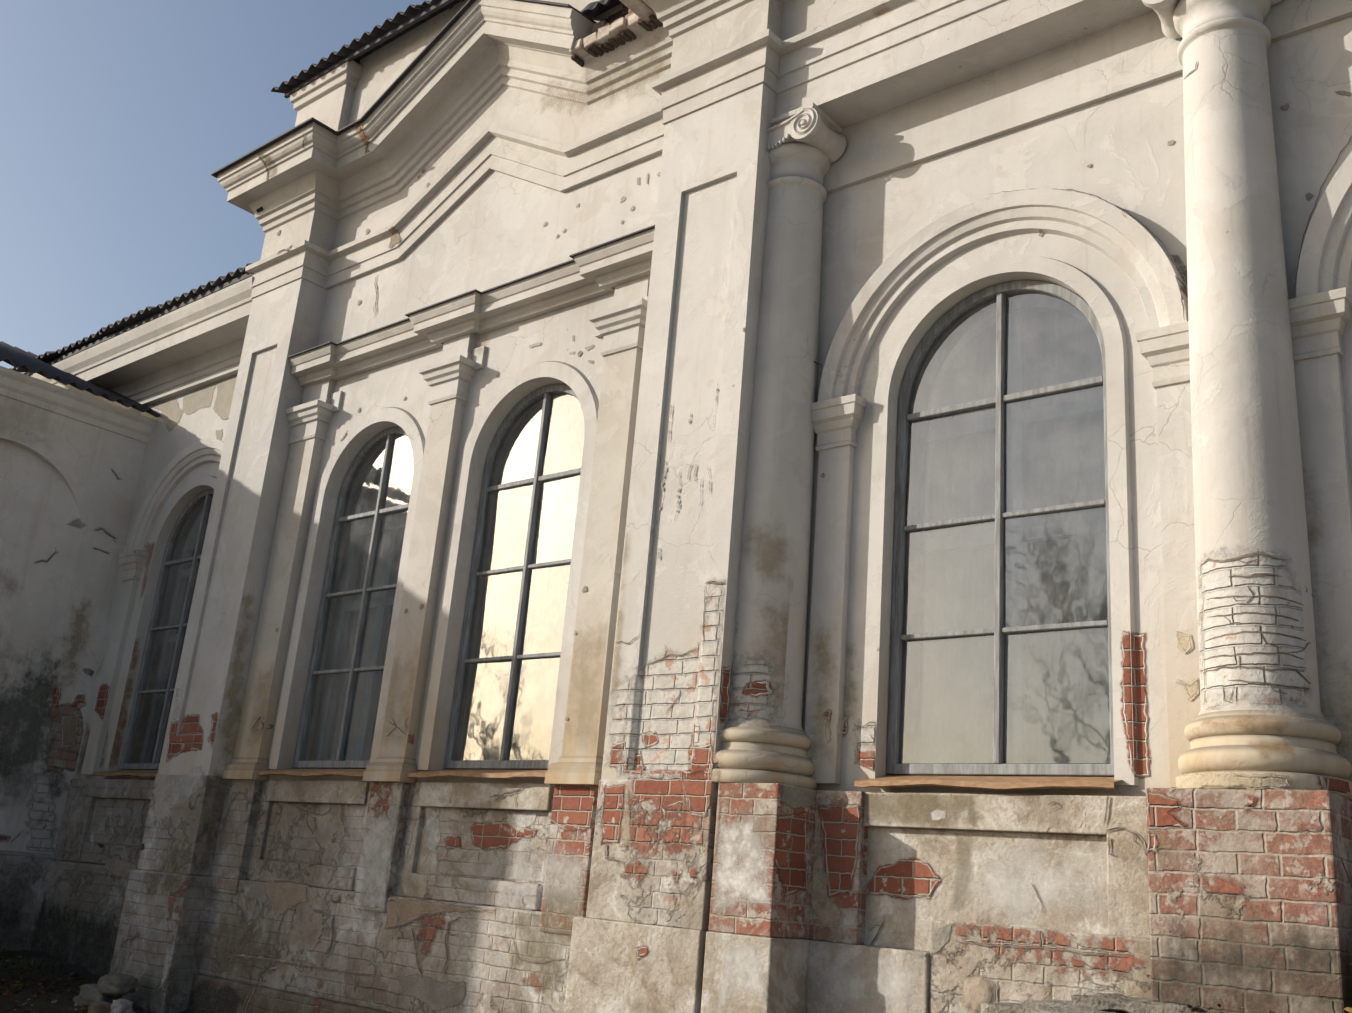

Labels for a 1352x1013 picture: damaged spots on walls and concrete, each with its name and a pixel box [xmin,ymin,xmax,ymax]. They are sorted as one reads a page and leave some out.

flaking render [1175,550,1320,708]
damp [0,676,63,796]
flaking render [45,657,111,773]
damp [78,641,137,771]
flaking render [166,689,218,762]
flaking render [426,579,779,881]
flaking render [775,804,941,900]
flaking render [954,925,1143,977]
flaking render [1120,631,1187,854]
flaking render [1195,875,1264,916]
flaking render [1244,795,1257,811]
flaking render [1319,776,1350,795]